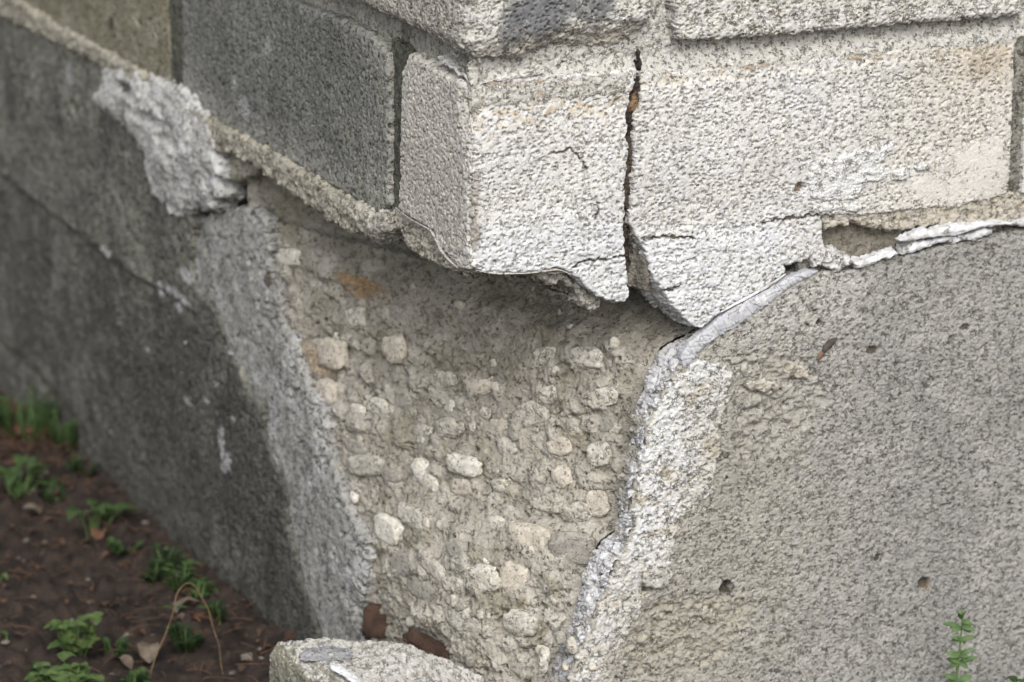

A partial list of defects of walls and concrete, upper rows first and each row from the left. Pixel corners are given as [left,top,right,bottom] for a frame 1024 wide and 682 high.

crack [552,147,588,169]
crack [573,49,694,271]
crack [761,213,820,223]
spalling [228,156,1024,682]